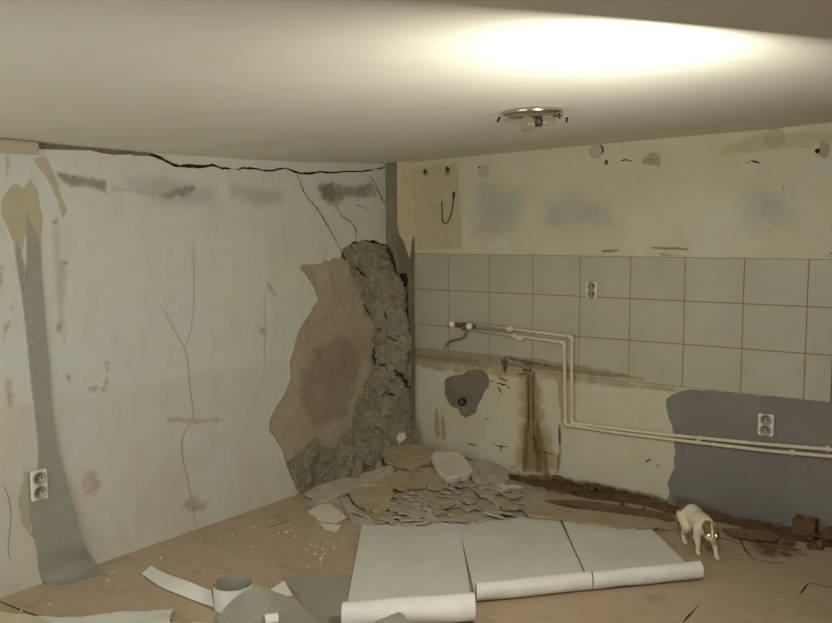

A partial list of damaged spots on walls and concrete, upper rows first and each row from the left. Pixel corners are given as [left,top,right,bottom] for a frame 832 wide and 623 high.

peeling [1,178,43,266]
peeling [33,156,67,217]
crack [38,143,386,261]
crack [160,306,198,526]
flaking render [267,244,376,483]
flaking render [445,370,510,418]
peeling [18,472,33,538]